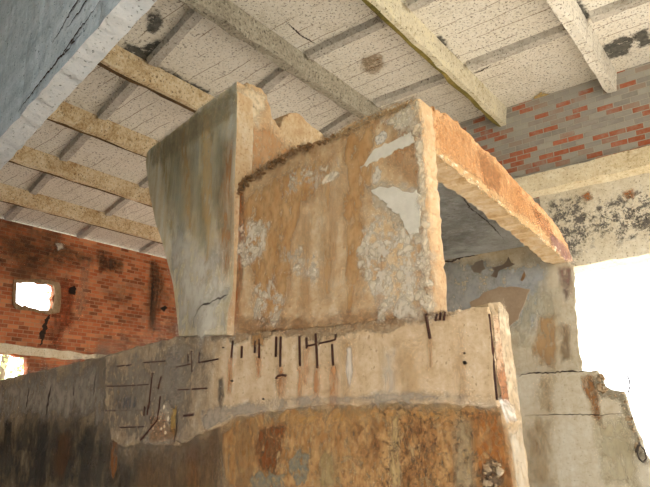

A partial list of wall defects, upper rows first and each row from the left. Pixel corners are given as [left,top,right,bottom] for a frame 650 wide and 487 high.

crack [18,0,100,112]
water stain [124,13,163,61]
water stain [603,29,650,59]
peeling [212,98,458,404]
flaking render [471,257,514,278]
water stain [549,191,650,257]
crack [39,314,50,346]
crack [192,294,229,328]
flaking render [470,270,531,326]
water stain [0,230,226,487]
crack [521,368,590,376]
spalling [594,373,645,461]